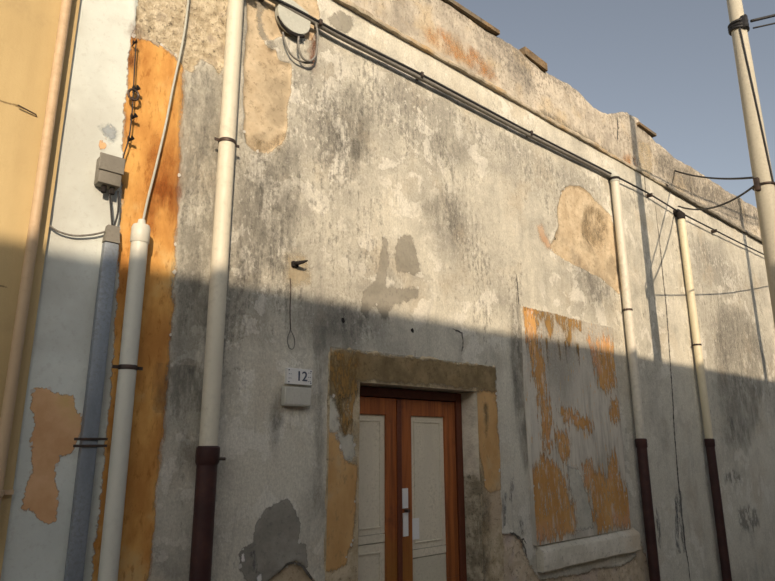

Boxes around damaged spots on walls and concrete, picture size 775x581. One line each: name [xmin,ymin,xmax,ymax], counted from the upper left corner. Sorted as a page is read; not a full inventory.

flaking render [243,0,292,155]
flaking render [293,0,353,40]
peeling [91,0,228,581]
flaking render [538,186,621,294]
peeling [21,387,83,524]
peeling [239,499,314,581]
peeling [326,394,358,572]
peeling [477,390,501,493]
peeling [523,306,631,545]
crack [644,176,690,577]